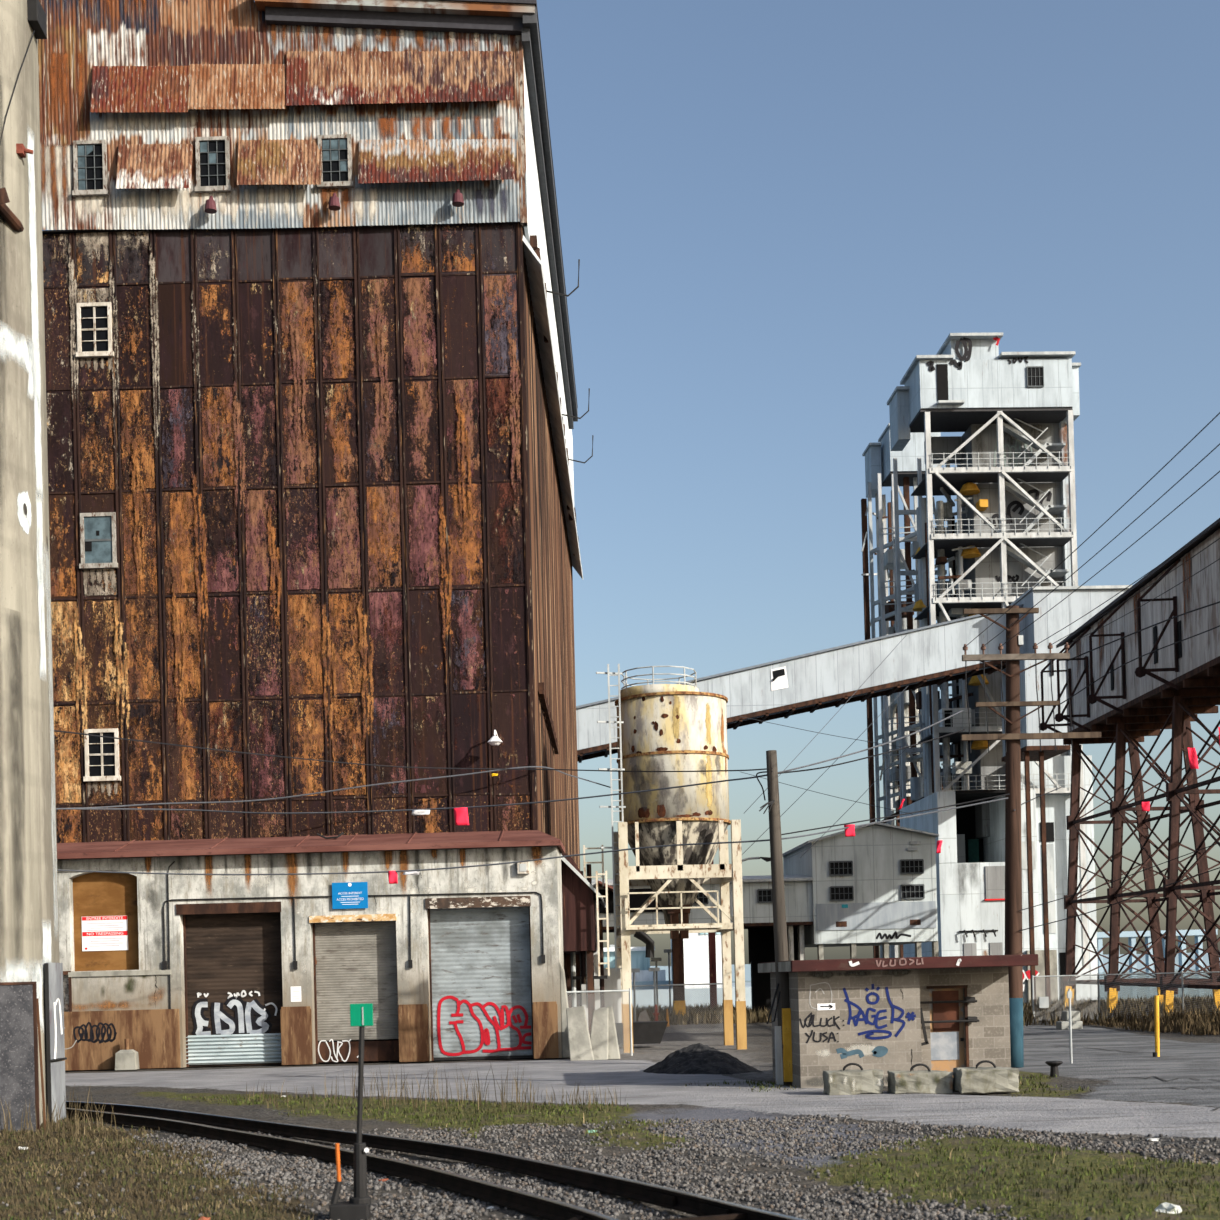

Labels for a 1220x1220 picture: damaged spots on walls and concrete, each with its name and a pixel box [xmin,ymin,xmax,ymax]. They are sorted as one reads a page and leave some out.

corrosion [41,144,68,202]
corrosion [507,318,524,556]
water stain [10,621,22,714]
water stain [12,742,23,900]
corrosion [73,604,88,766]
corrosion [114,601,139,754]
corrosion [172,472,209,725]
corrosion [267,504,282,632]
corrosion [286,854,297,902]
corrosion [357,594,374,743]
corrosion [438,387,473,683]
corrosion [631,690,727,818]